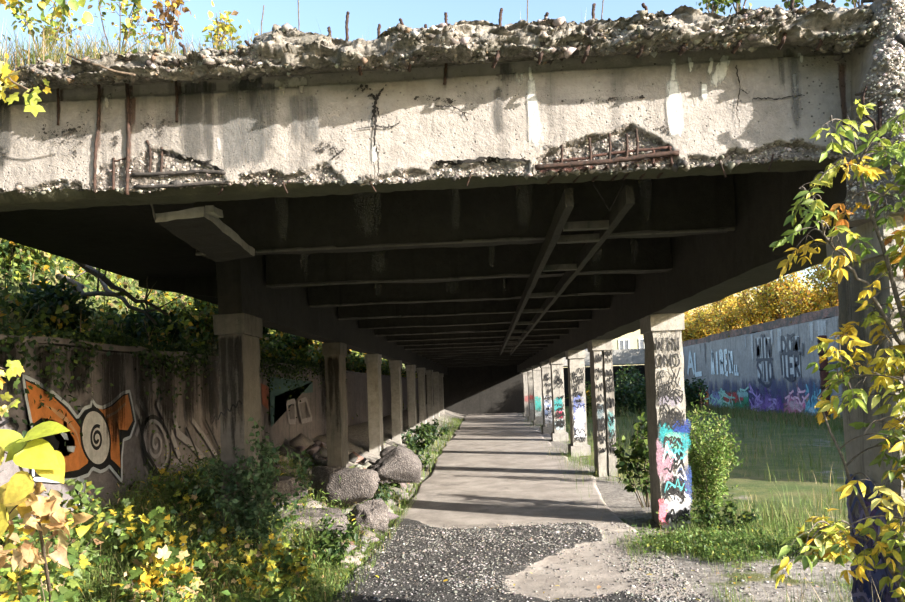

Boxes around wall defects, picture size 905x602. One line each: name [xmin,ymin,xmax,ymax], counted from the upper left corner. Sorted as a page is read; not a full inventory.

water stain [0,101,10,170]
water stain [178,77,319,168]
crack [357,87,400,176]
spalling [0,0,883,195]
water stain [494,63,541,144]
efflorescence [667,59,683,135]
efflorescence [701,55,730,98]
crack [735,65,805,133]